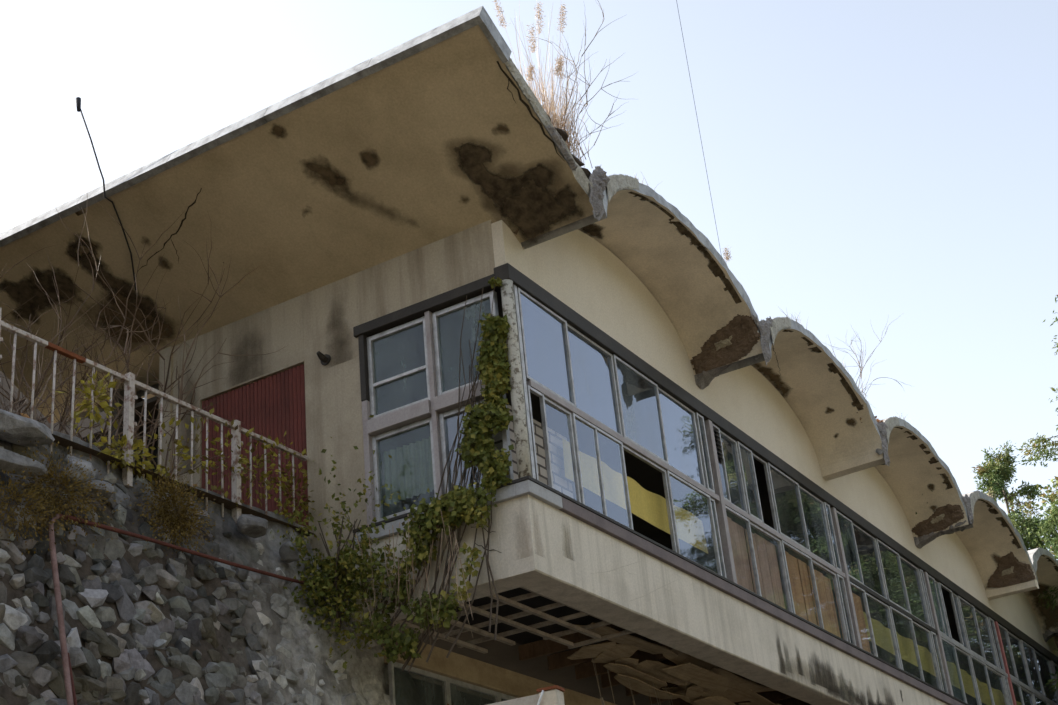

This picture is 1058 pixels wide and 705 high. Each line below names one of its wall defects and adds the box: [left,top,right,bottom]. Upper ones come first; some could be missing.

water stain [272,125,285,137]
water stain [304,162,356,200]
water stain [360,152,379,167]
spalling [505,58,578,171]
crack [138,188,202,271]
peeling [453,143,822,374]
peeling [827,363,863,411]
spalling [875,416,1036,588]
water stain [778,644,903,705]